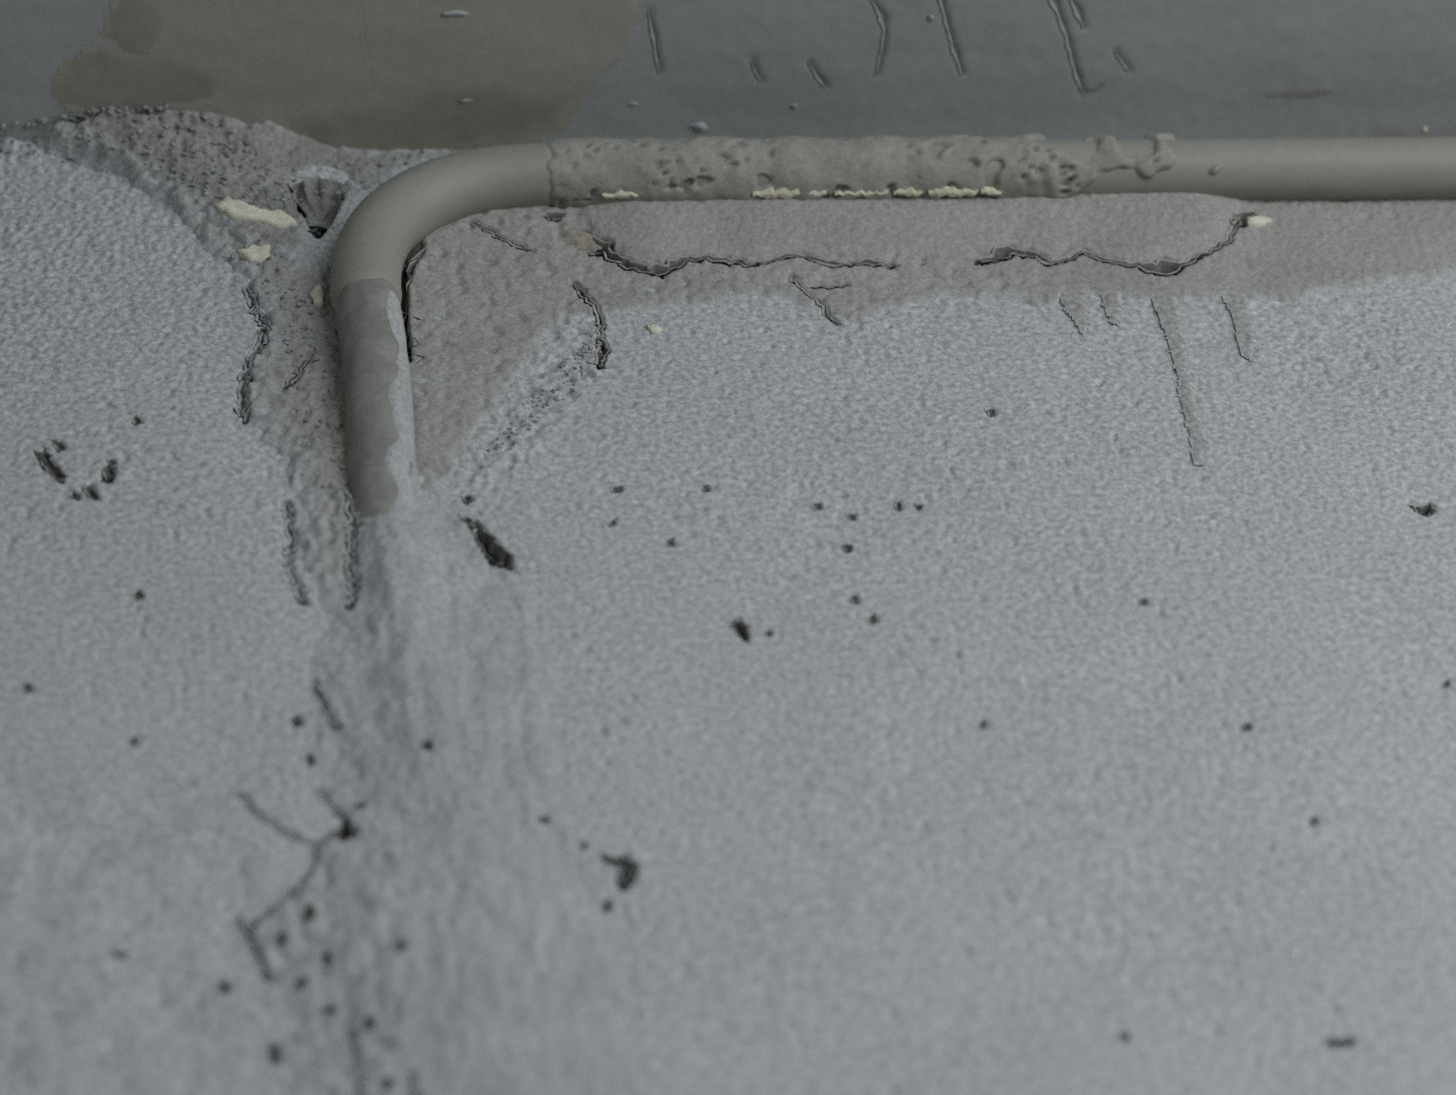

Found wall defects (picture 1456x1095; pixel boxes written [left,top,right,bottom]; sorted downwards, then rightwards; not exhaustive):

crack [573,234,896,370]
crack [977,217,1242,277]